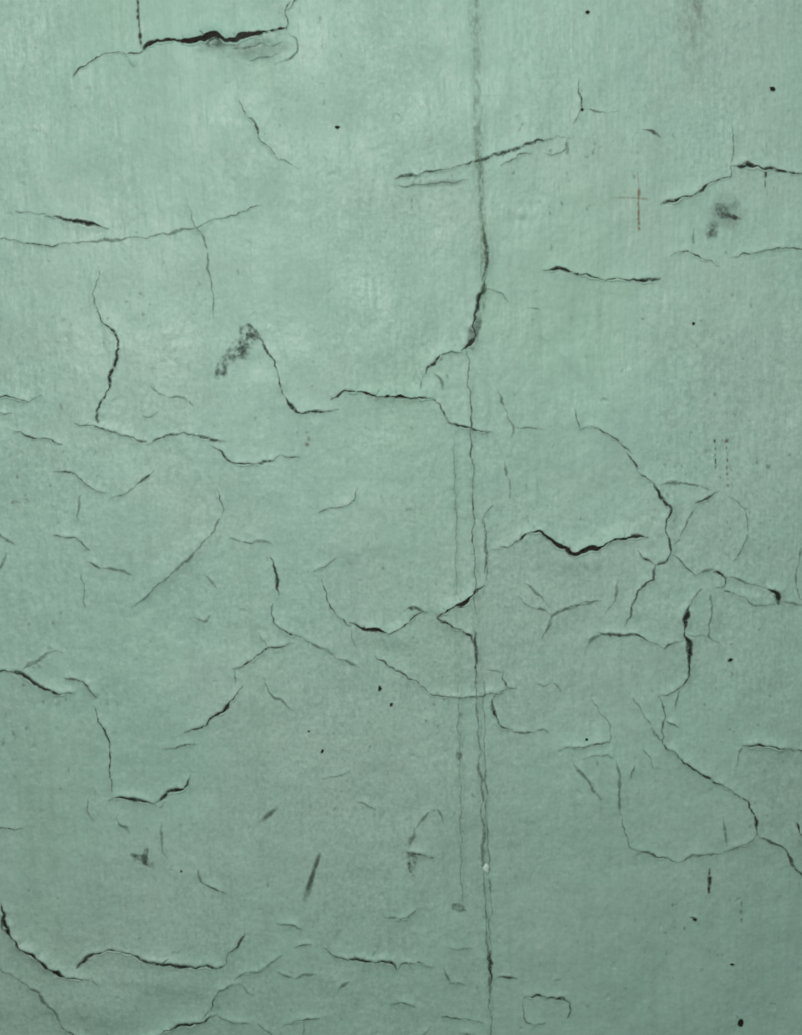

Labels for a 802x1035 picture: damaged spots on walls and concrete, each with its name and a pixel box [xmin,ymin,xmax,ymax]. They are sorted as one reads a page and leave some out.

crack [0,205,261,305]
crack [0,226,802,1035]